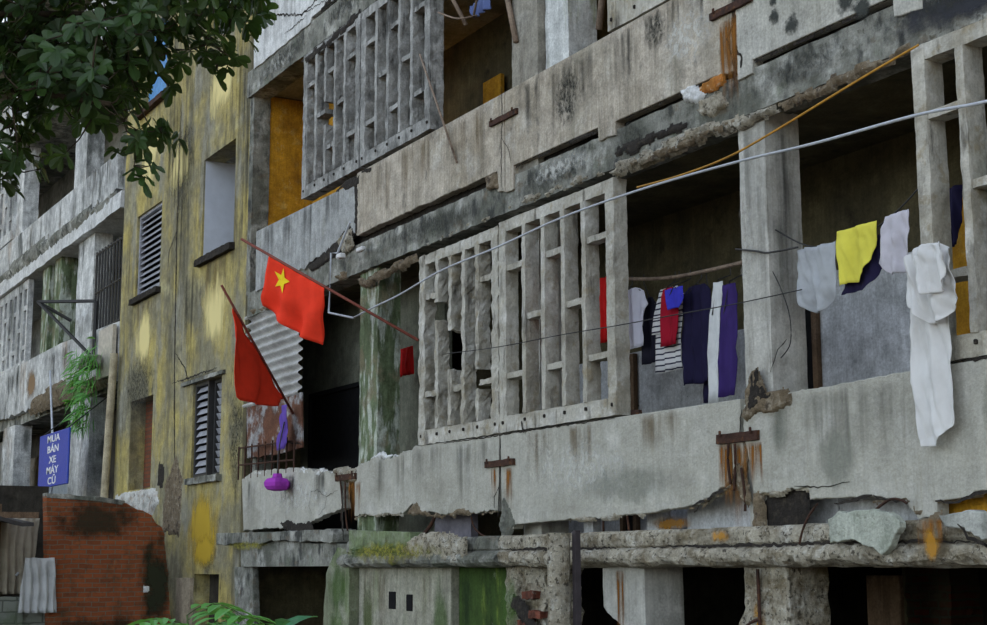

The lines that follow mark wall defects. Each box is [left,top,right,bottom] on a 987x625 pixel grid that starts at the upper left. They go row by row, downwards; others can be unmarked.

damp [839,0,869,16]
rust [720,18,737,85]
spalling [508,42,911,209]
spalling [115,456,183,538]
rust [494,469,511,491]
rust [719,444,762,493]
spalling [689,444,819,544]
flaking render [828,497,943,555]
rust [923,521,942,558]
spalling [507,590,548,625]
spalling [746,569,762,625]